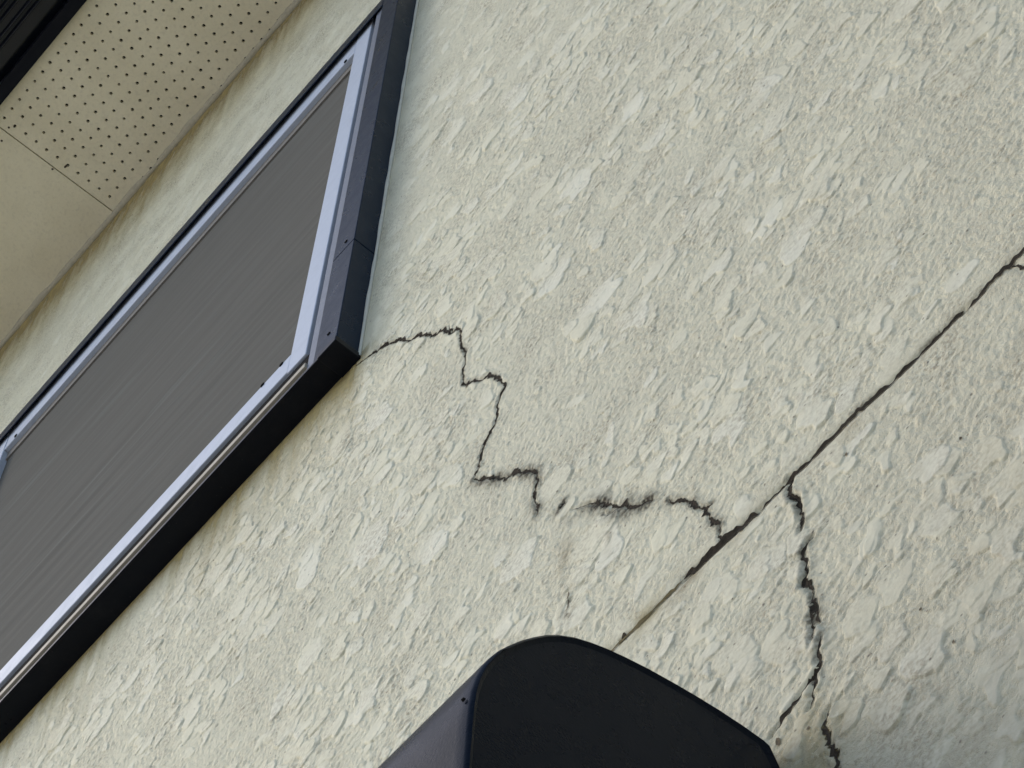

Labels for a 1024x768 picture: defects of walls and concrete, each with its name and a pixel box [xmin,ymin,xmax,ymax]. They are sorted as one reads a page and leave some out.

crack [357,247,1024,768]